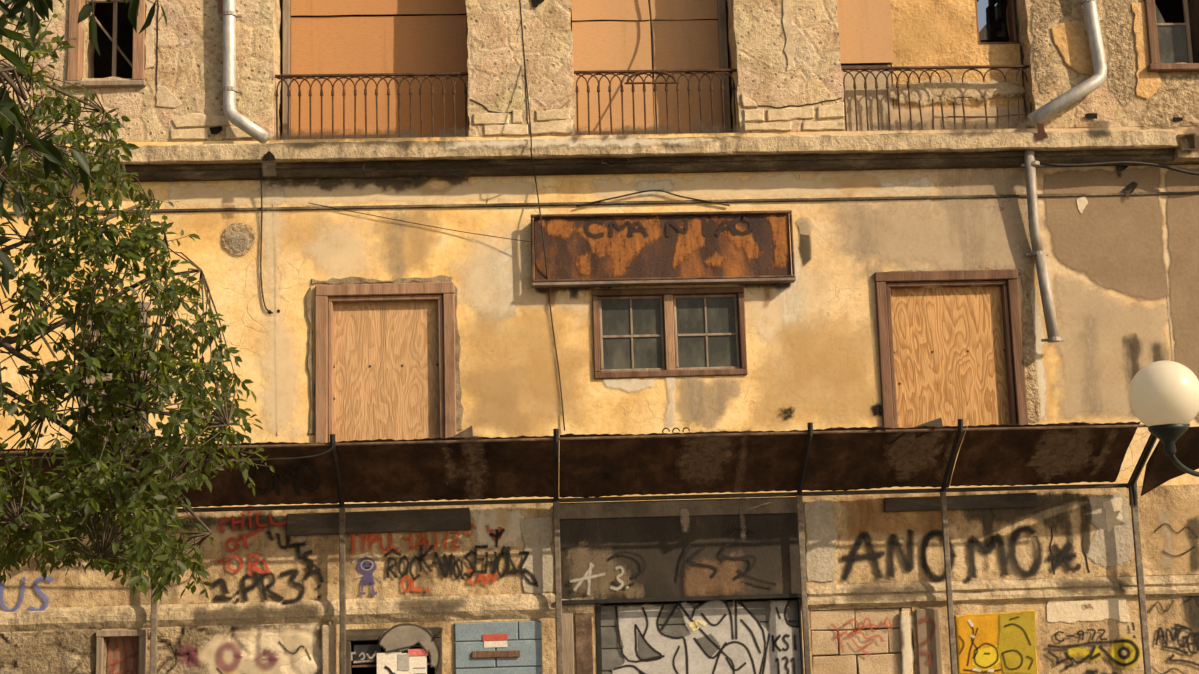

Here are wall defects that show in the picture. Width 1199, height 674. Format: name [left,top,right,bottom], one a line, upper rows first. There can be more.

flaking render [1032,0,1199,151]
flaking render [889,76,1027,130]
flaking render [1077,197,1088,213]
spalling [1116,165,1138,199]
damp [168,162,533,429]
damp [467,228,587,319]
damp [603,377,739,427]
rust [678,430,750,481]
rust [889,431,957,478]
rust [1030,428,1114,478]